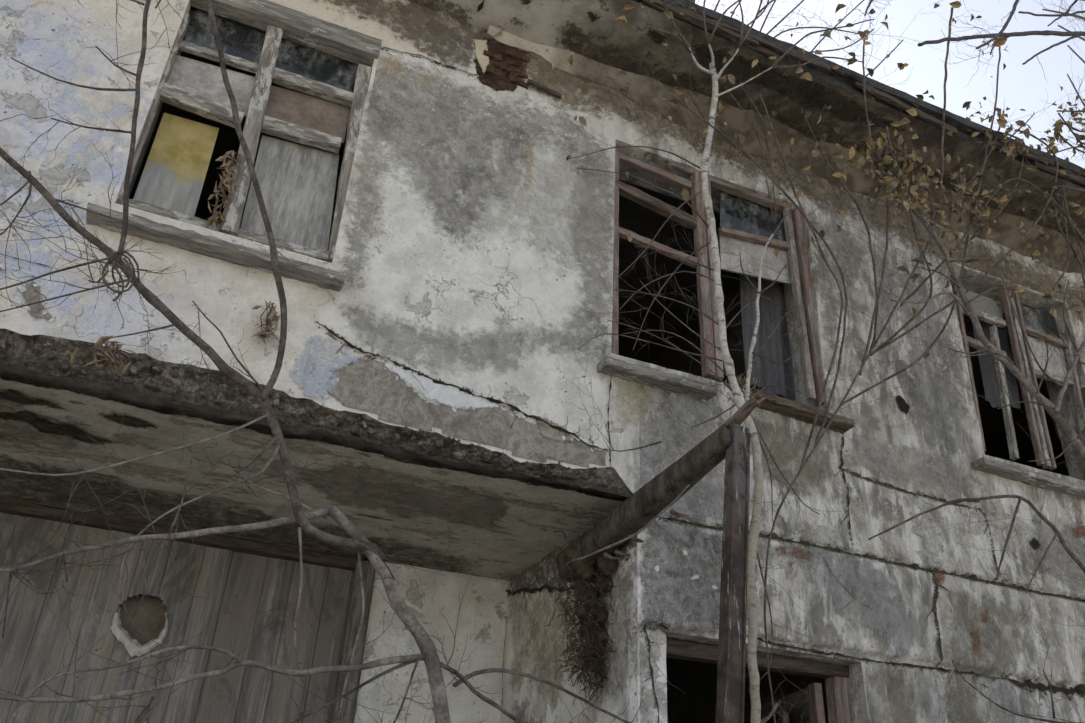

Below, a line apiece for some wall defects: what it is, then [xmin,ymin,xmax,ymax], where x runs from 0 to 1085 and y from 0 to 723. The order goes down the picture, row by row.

water stain [315,0,496,70]
peeling [473,39,490,73]
peeling [17,282,54,322]
water stain [339,23,1085,500]
spalling [0,328,725,497]
crack [314,320,611,465]
crack [658,435,1085,701]